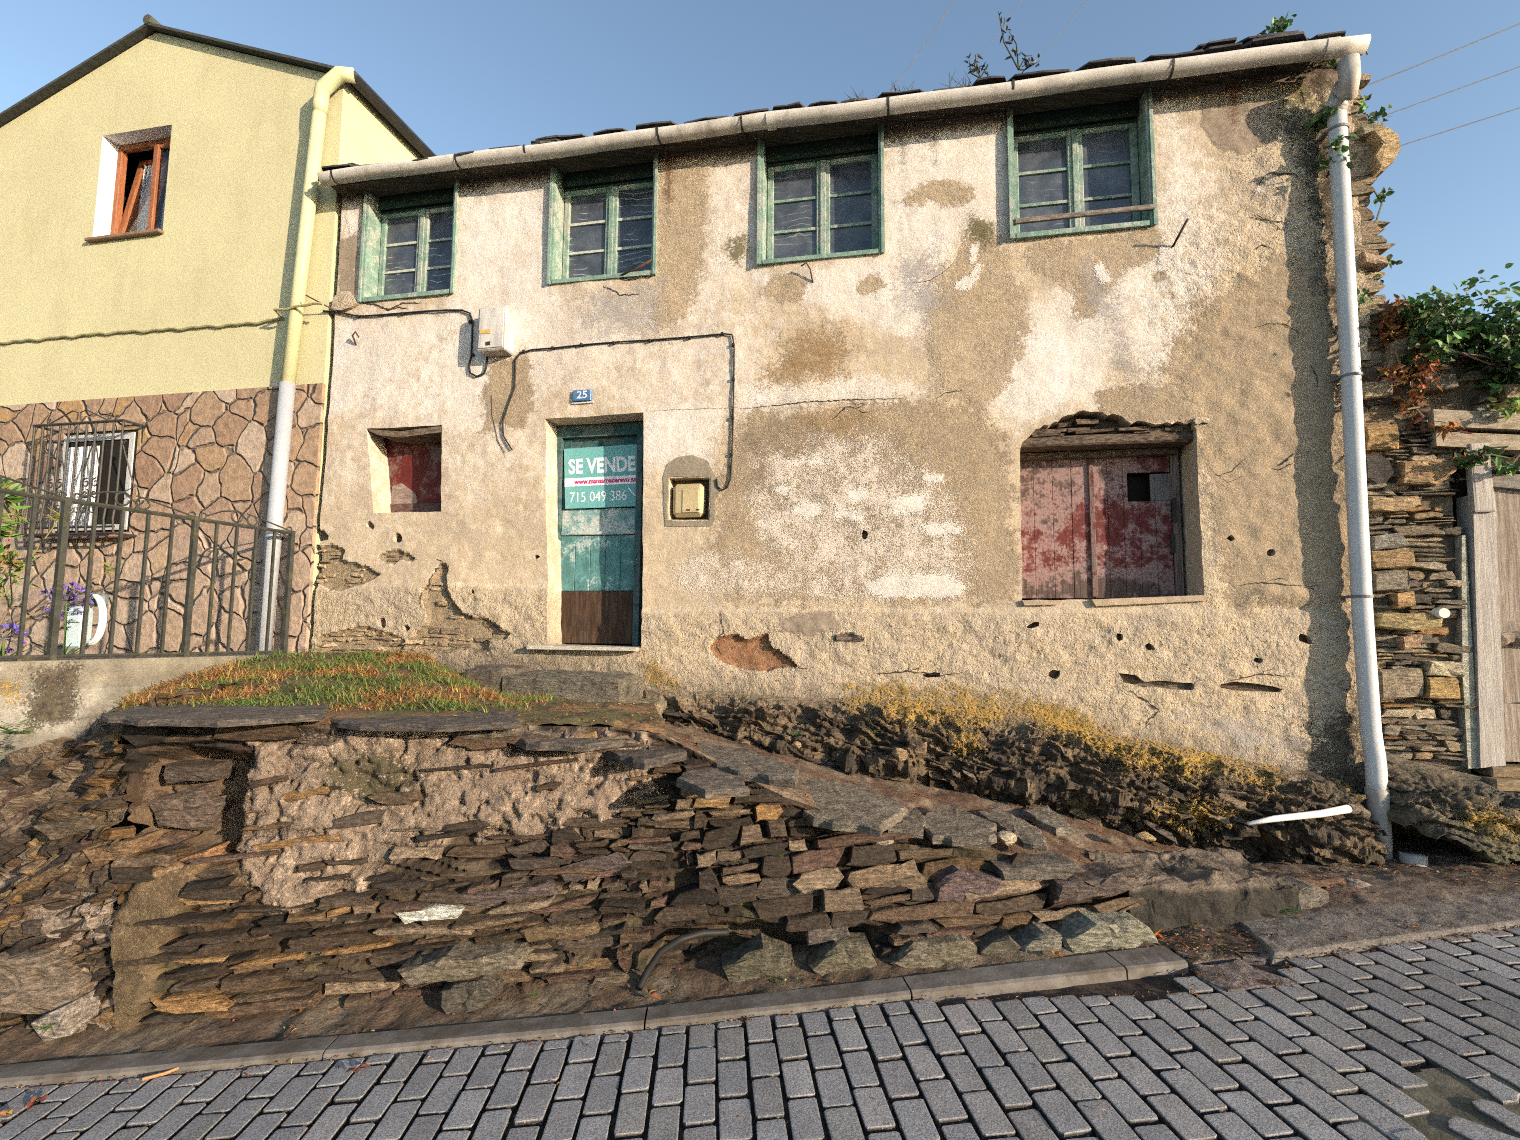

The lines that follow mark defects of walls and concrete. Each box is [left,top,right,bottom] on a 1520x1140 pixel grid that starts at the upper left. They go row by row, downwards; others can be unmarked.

peeling [651,153,717,335]
damp [709,316,974,595]
peeling [660,178,1171,628]
peeling [1091,242,1351,626]
spalling [316,532,415,591]
spalling [316,563,510,653]
spalling [710,633,798,671]
spalling [832,633,863,643]
crack [1130,690,1160,723]